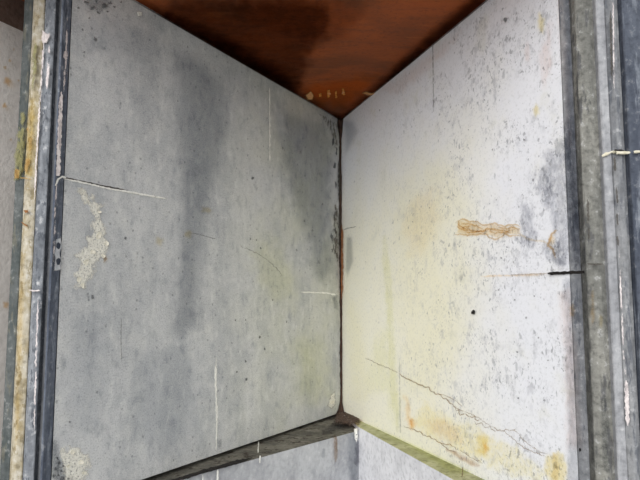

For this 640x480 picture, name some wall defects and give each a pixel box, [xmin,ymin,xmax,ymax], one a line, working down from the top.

damp [141,5,324,161]
crack [65,177,128,191]
peeling [74,188,109,289]
rust [336,117,344,414]
peeling [60,447,91,480]
crack [406,427,477,476]
crack [400,374,544,456]